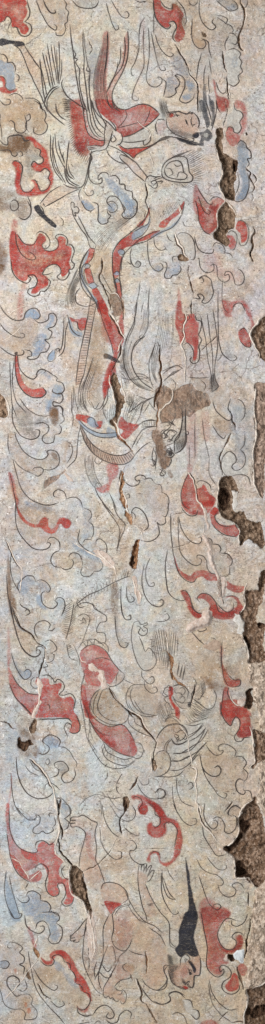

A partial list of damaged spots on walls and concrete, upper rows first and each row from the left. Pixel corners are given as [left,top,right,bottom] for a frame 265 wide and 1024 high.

spalling [213,128,238,246]
spalling [249,316,265,361]
crack [95,422,143,569]
peeling [152,384,211,469]
spalling [201,476,265,604]
spalling [252,382,265,500]
spalling [17,708,37,751]
spalling [230,688,253,709]
spalling [250,728,265,769]
crack [12,758,180,887]
spalling [68,865,98,968]
spalling [222,796,265,1024]